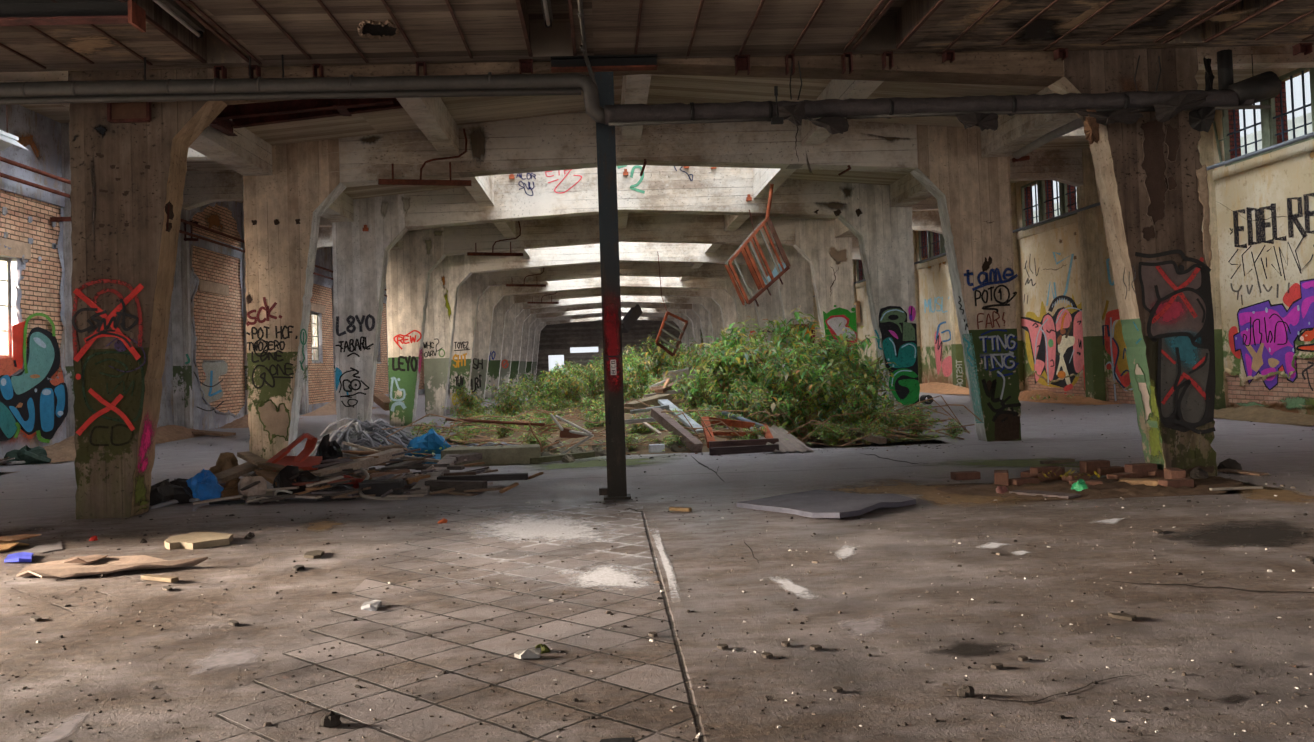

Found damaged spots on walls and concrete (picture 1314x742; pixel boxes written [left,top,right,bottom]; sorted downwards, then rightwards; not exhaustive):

peeling [1140,119,1181,242]
spalling [0,190,67,381]
spalling [165,201,291,444]
water stain [1163,521,1313,547]
crack [942,674,1145,702]